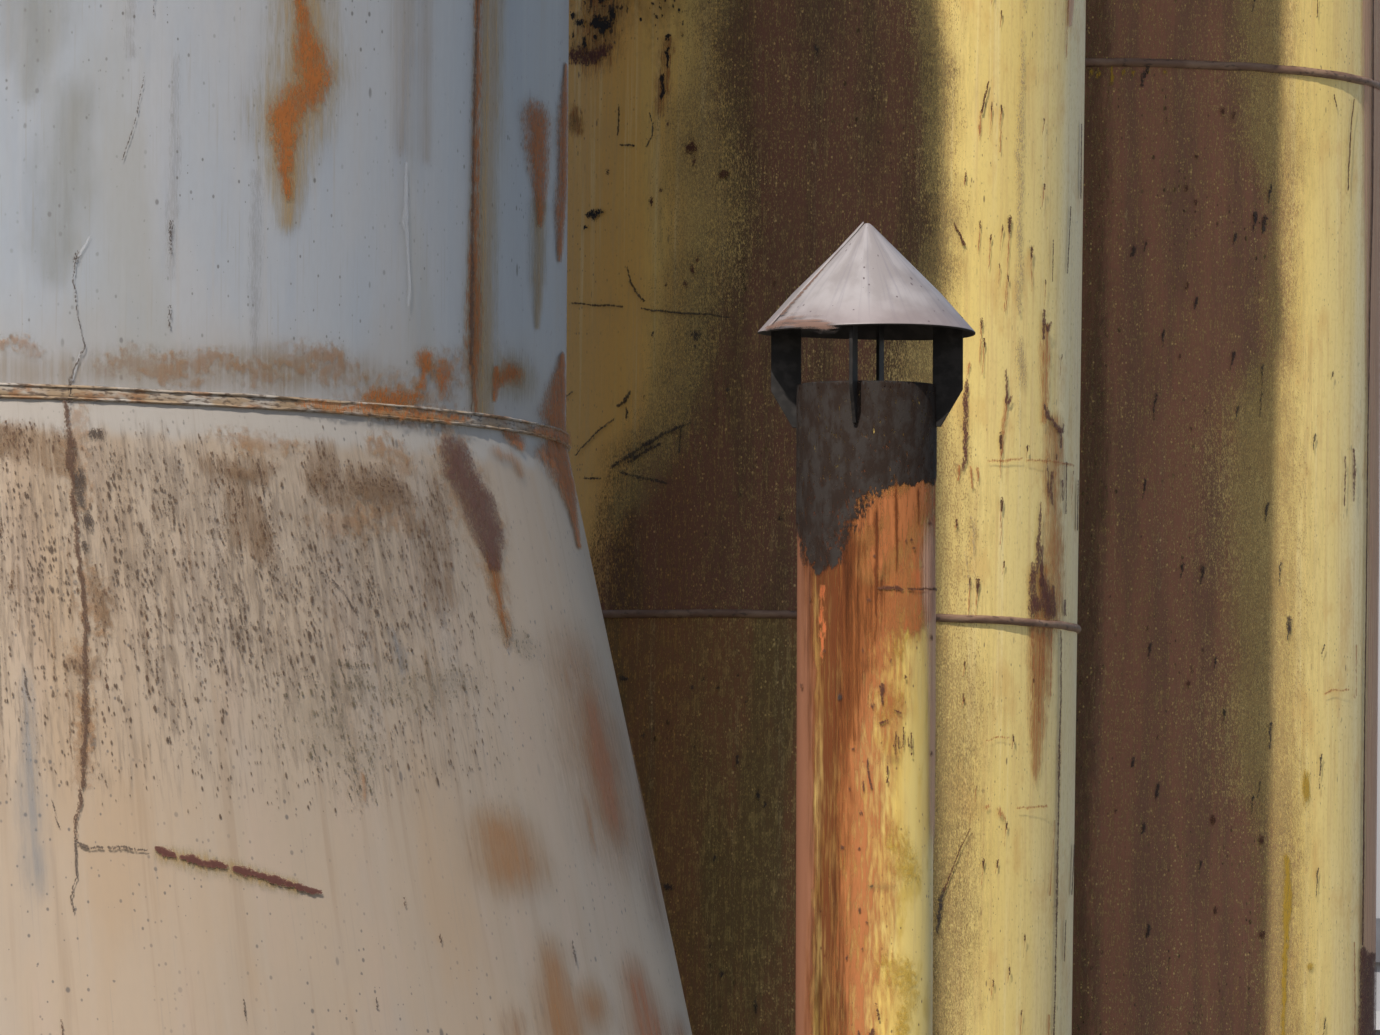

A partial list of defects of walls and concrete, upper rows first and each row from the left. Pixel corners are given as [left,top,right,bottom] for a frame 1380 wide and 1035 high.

crack [62,250,147,912]
corrosion [265,0,337,227]
corrosion [289,0,526,643]
corrosion [498,351,581,548]
corrosion [521,62,582,325]
corrosion [584,209,604,229]
corrosion [796,436,936,1035]
corrosion [978,39,1074,783]